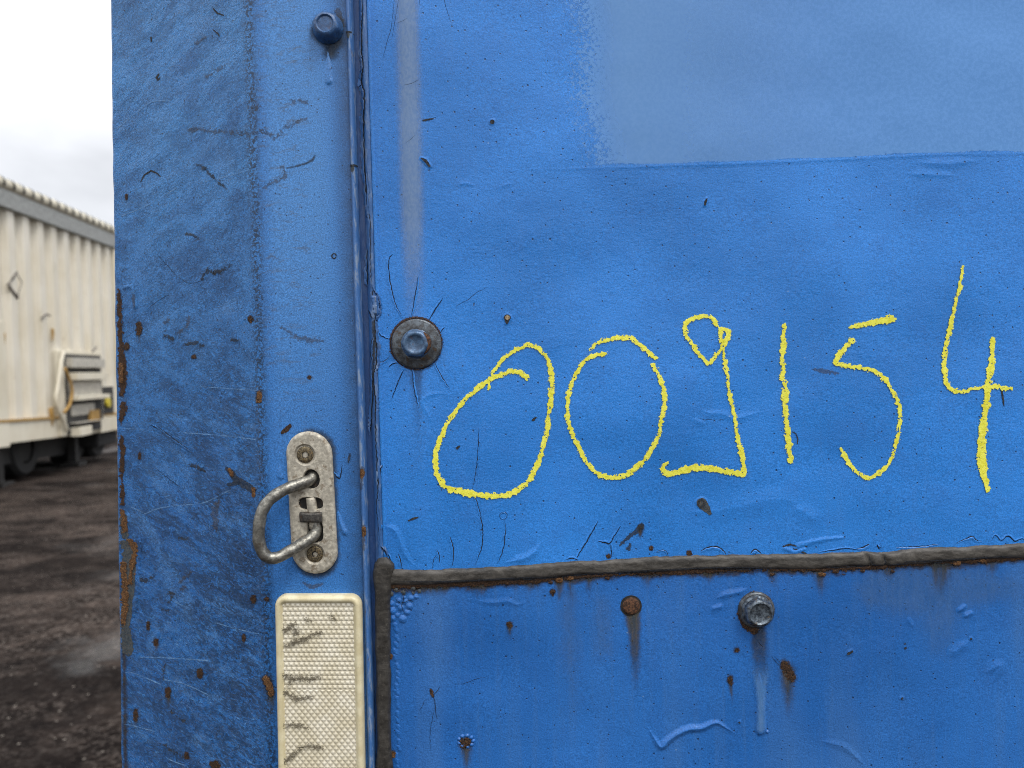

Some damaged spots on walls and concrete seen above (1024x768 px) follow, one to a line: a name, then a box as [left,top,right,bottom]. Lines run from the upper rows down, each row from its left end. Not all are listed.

rust [116,289,143,506]
rust [391,558,1024,596]
rust [627,612,640,658]
rust [262,675,274,705]
rust [772,657,796,694]
rust [457,733,475,761]